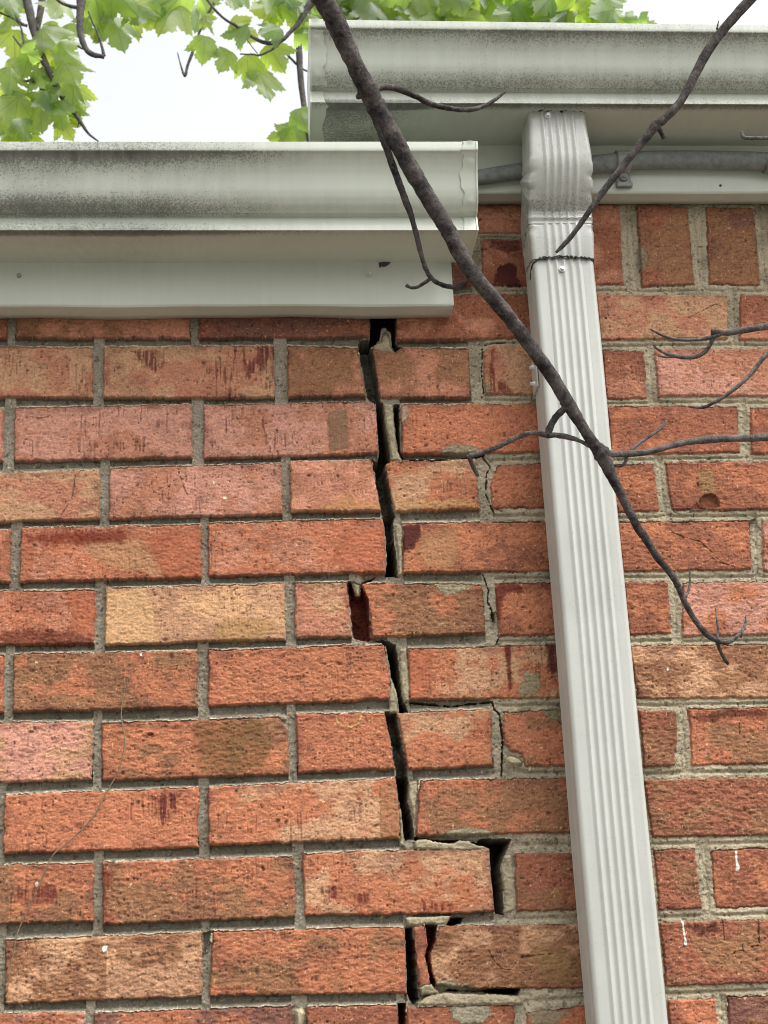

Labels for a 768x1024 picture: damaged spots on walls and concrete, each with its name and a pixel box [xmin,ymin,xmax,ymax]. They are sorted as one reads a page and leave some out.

crack [347,318,517,916]
crack [397,915,551,1024]